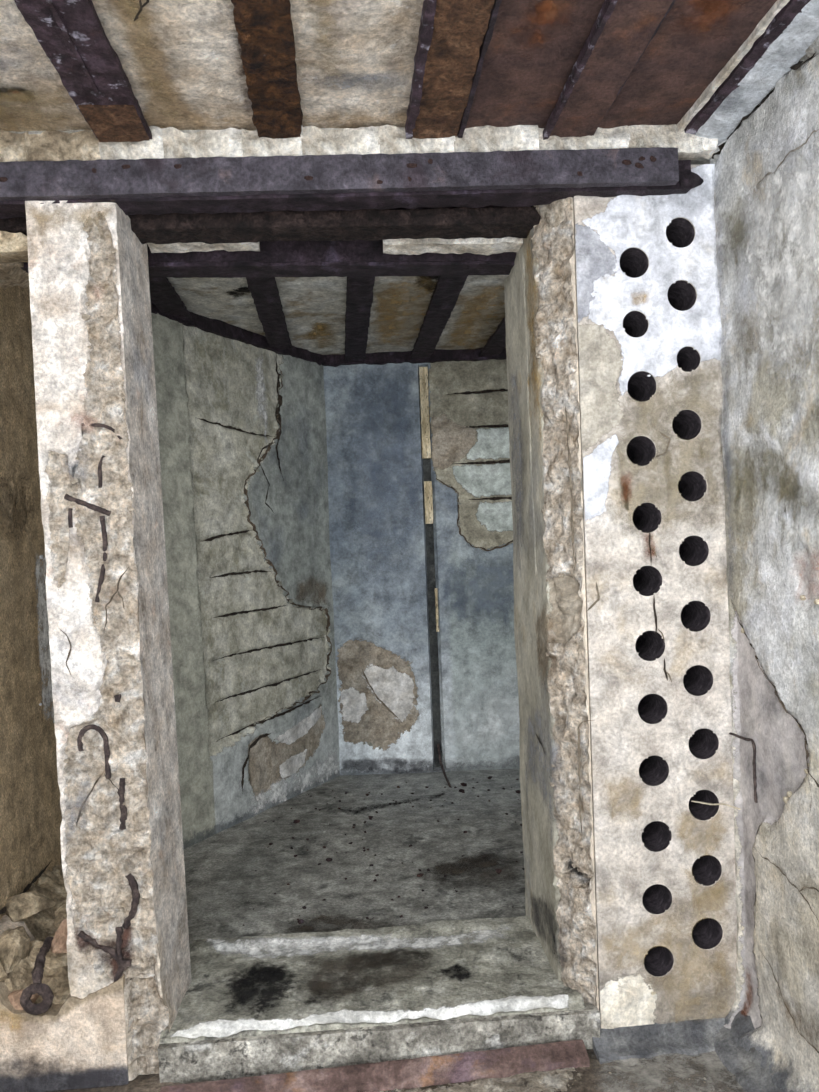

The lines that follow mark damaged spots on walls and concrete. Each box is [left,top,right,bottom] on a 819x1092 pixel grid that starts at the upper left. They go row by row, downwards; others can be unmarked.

crack [257,355,284,514]
spalling [36,164,722,1075]
crack [241,733,271,791]
peeling [724,609,810,1034]
crack [754,847,819,922]
rust [76,926,132,976]
leakage [224,949,431,1019]
leakage [442,965,471,982]